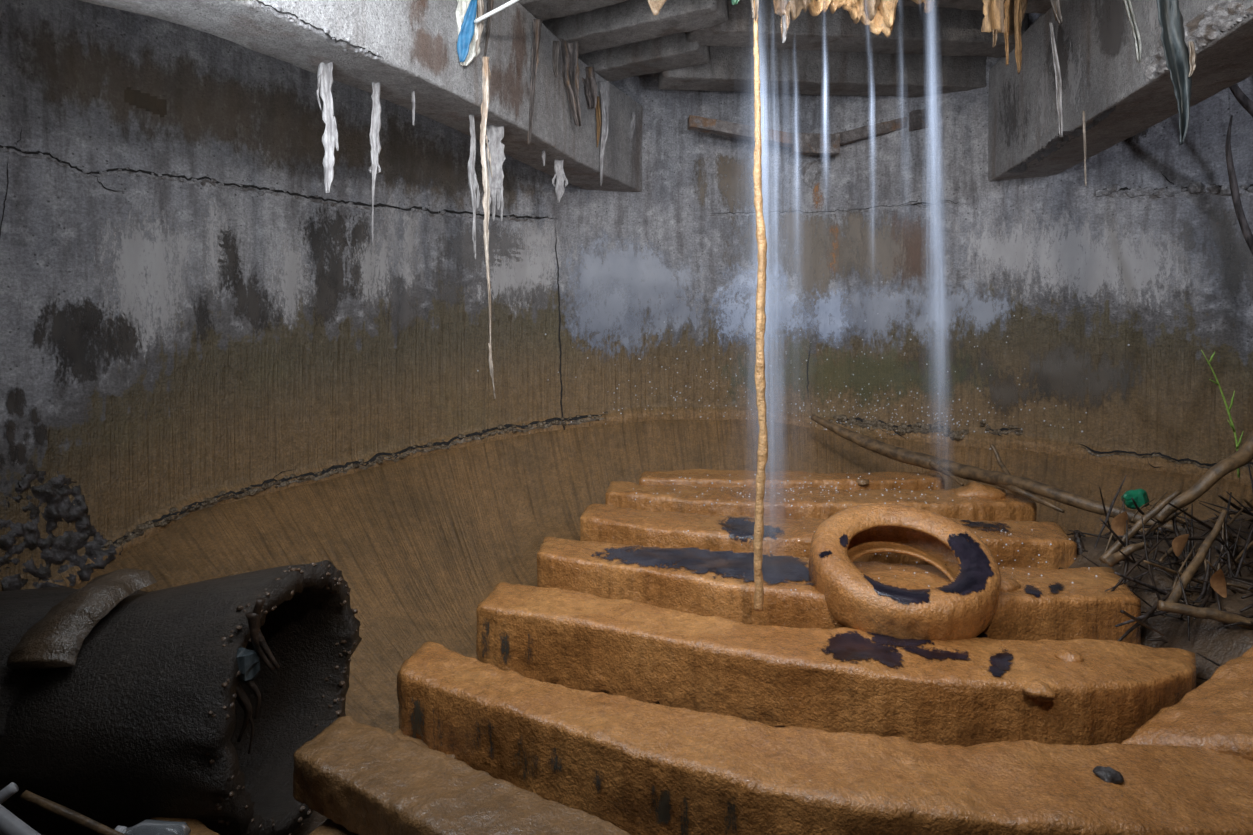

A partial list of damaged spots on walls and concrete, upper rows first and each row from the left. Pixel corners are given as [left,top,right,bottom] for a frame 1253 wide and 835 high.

leakage [16,21,541,389]
crack [0,124,608,555]
crack [230,0,382,60]
leakage [435,155,1253,414]